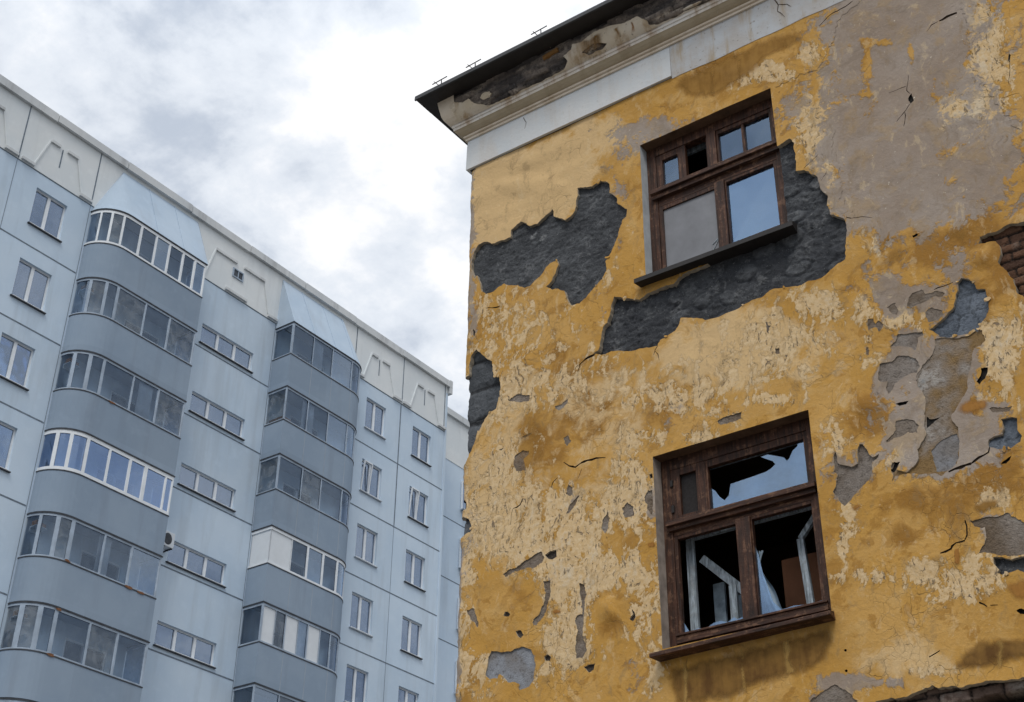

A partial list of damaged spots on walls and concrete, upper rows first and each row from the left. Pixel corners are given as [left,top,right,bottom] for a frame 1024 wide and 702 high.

spalling [454,0,710,106]
peeling [593,0,1024,355]
spalling [471,179,627,305]
spalling [466,349,530,453]
peeling [878,278,991,481]
spalling [988,406,1022,464]
crack [551,457,606,487]
peeling [833,444,879,506]
crack [940,520,968,554]
peeling [971,513,1024,576]
peeling [485,630,551,690]